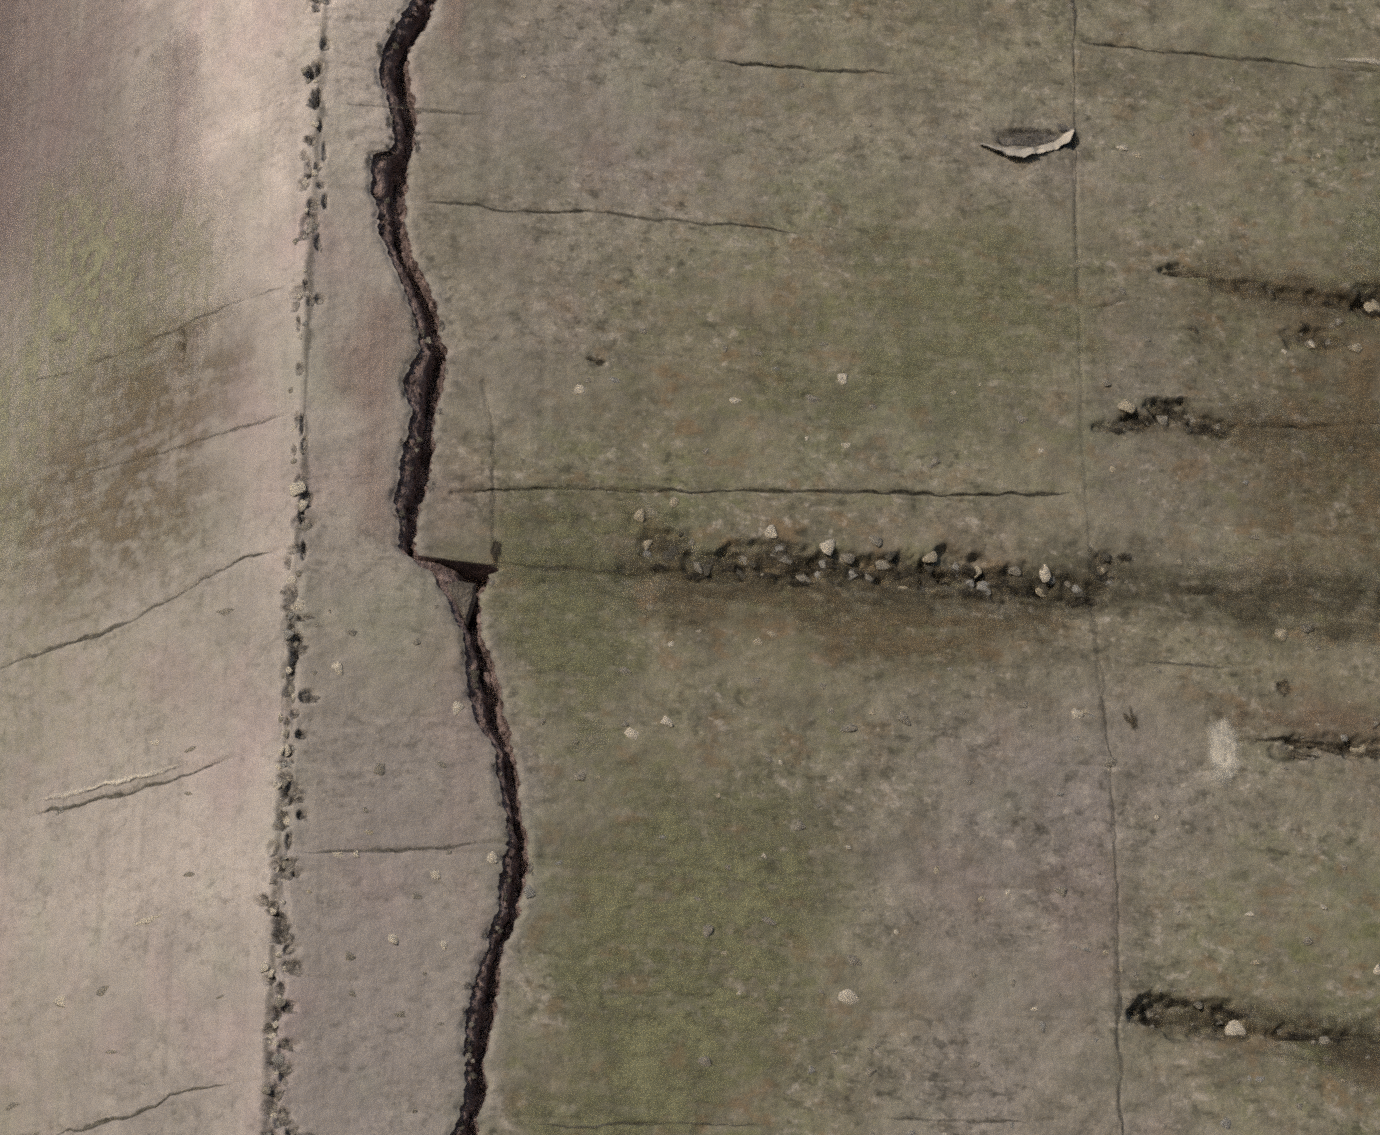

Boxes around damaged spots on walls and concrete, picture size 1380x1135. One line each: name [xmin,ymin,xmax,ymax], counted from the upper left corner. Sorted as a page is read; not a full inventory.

crack [721,60,889,73]
peeling [979,124,1074,158]
crack [106,309,219,358]
crack [473,487,1066,496]
crack [316,0,795,1135]
hole [872,555,999,588]
spalling [1035,577,1103,600]
crack [978,1116,1022,1124]